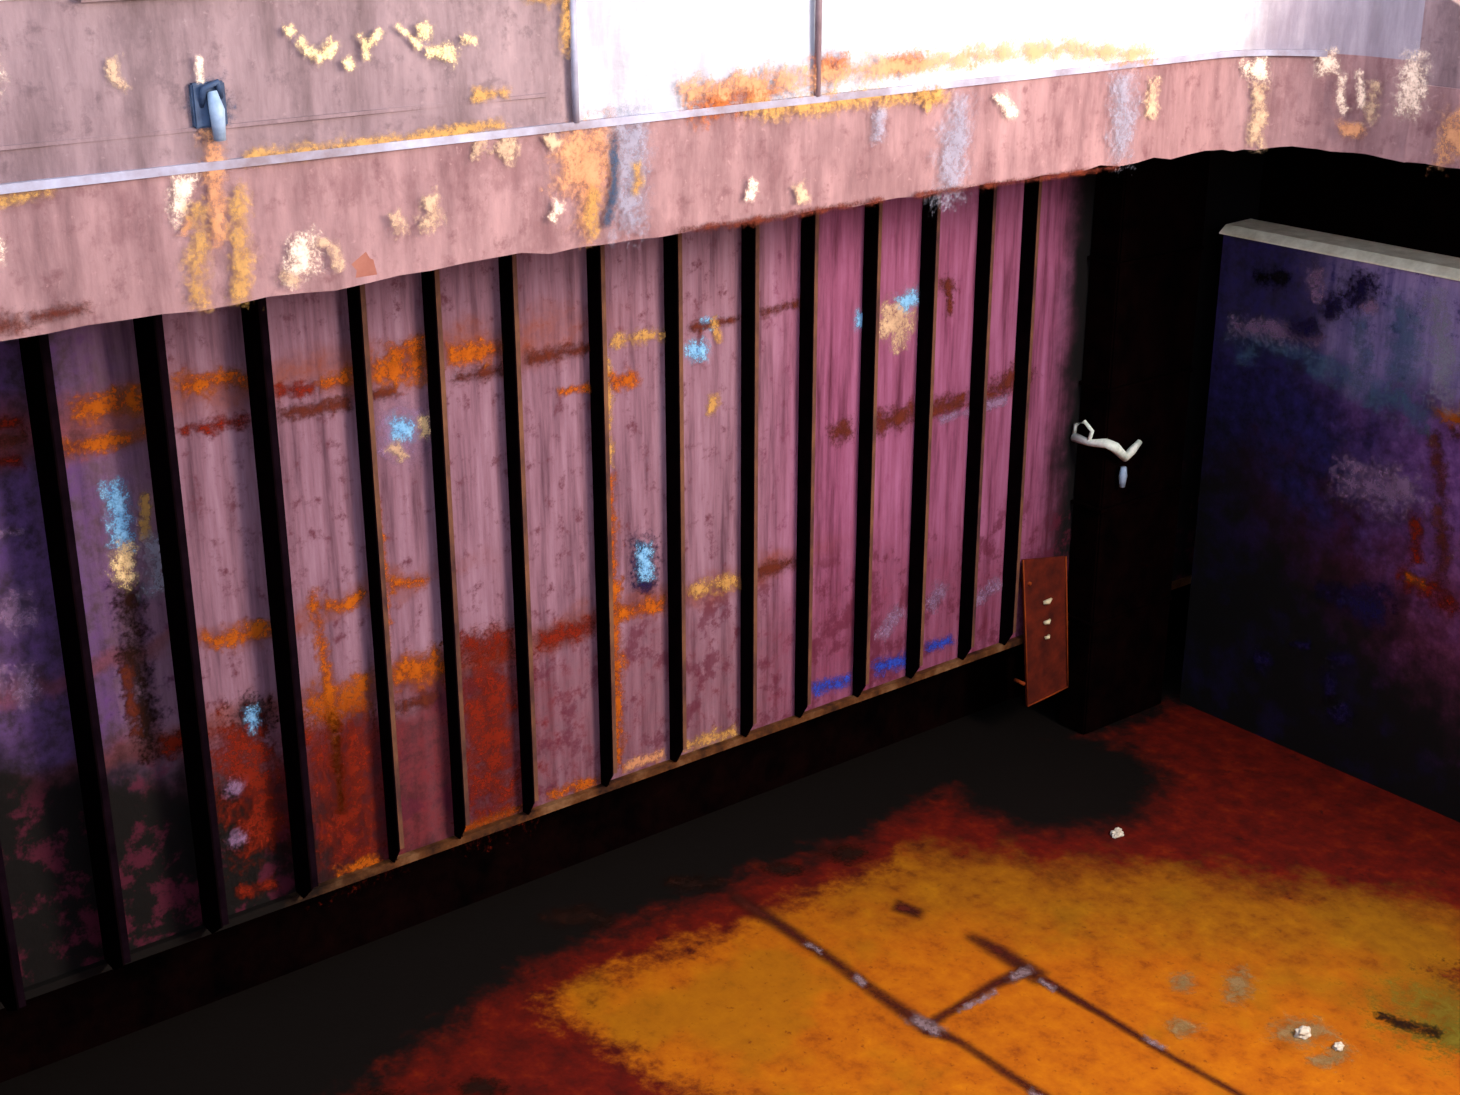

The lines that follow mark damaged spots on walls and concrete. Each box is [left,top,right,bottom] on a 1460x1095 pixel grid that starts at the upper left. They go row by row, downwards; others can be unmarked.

rust [185,129,256,308]
rust [244,119,504,158]
peeling [283,21,477,71]
rust [552,111,613,237]
rust [676,32,1155,129]
peeling [1239,56,1269,148]
peeling [1318,49,1431,137]
rust [62,384,146,455]
rust [274,367,353,421]
rust [302,589,388,877]
rust [392,623,522,832]
rust [208,707,290,865]